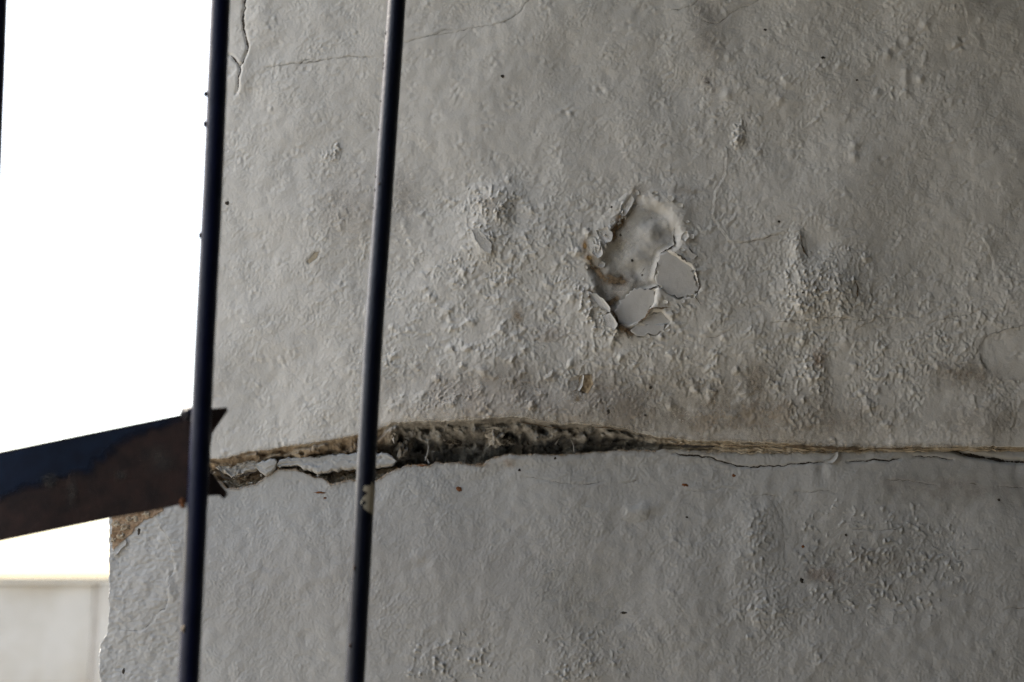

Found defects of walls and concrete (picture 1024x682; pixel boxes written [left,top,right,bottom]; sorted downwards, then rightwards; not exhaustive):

crack [231,0,249,89]
peeling [573,190,701,342]
crack [210,416,1024,490]